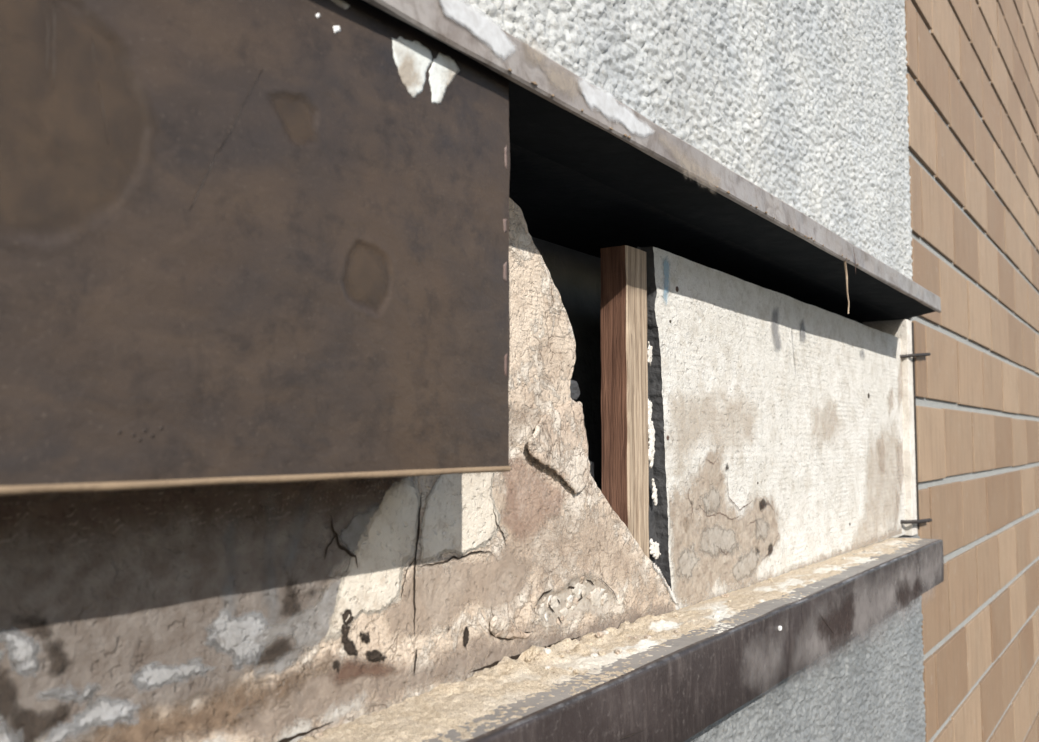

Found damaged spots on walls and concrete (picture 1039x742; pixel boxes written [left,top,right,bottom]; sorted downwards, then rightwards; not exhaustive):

peeling [392,36,460,104]
flaking render [527,400,590,493]
peeling [648,399,657,507]
water stain [0,477,641,742]
crack [324,516,358,568]
peeling [205,472,501,674]
crack [401,493,506,674]
flaking render [534,575,618,626]
peeling [649,526,759,606]
peeling [0,630,40,676]
peeling [39,684,139,742]
peeling [132,658,214,690]